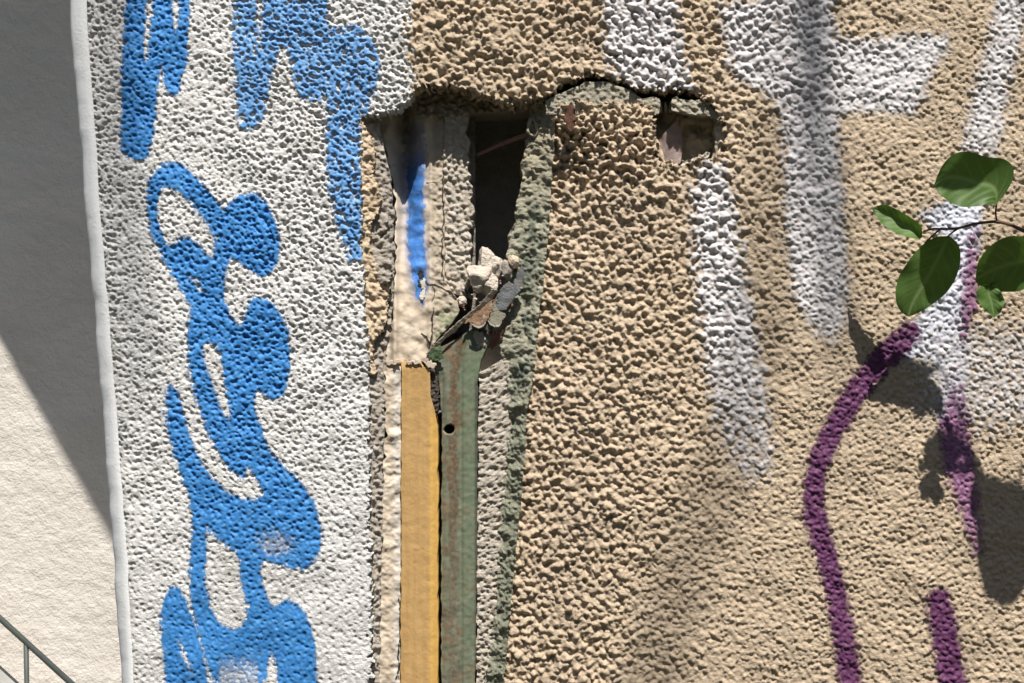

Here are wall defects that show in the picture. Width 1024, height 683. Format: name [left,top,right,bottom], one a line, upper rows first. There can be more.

spalling [416,89,531,266]
spalling [653,97,726,166]
peeling [356,122,525,415]